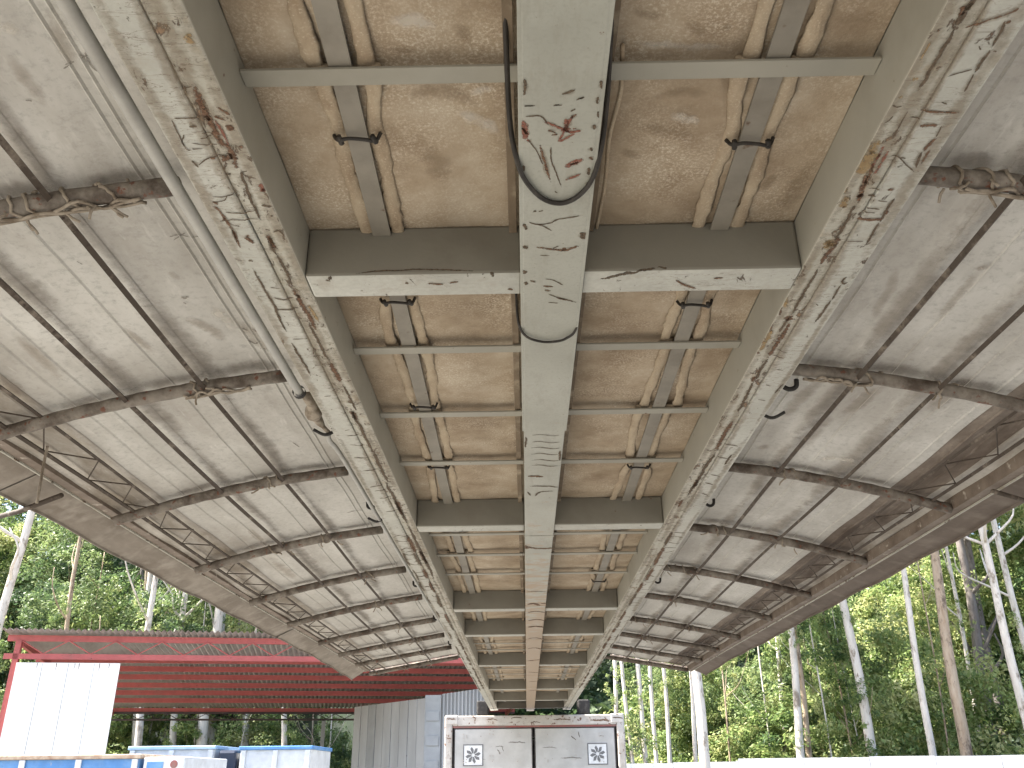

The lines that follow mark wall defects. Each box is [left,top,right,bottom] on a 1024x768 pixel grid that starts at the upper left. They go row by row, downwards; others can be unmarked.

peeling [964,20,1011,91]
corrosion [521,120,530,142]
corrosion [548,114,581,142]
peeling [915,127,941,167]
peeling [240,172,260,219]
crack [523,98,586,303]
peeling [866,199,894,244]
peeling [248,260,298,330]
crack [524,438,561,467]